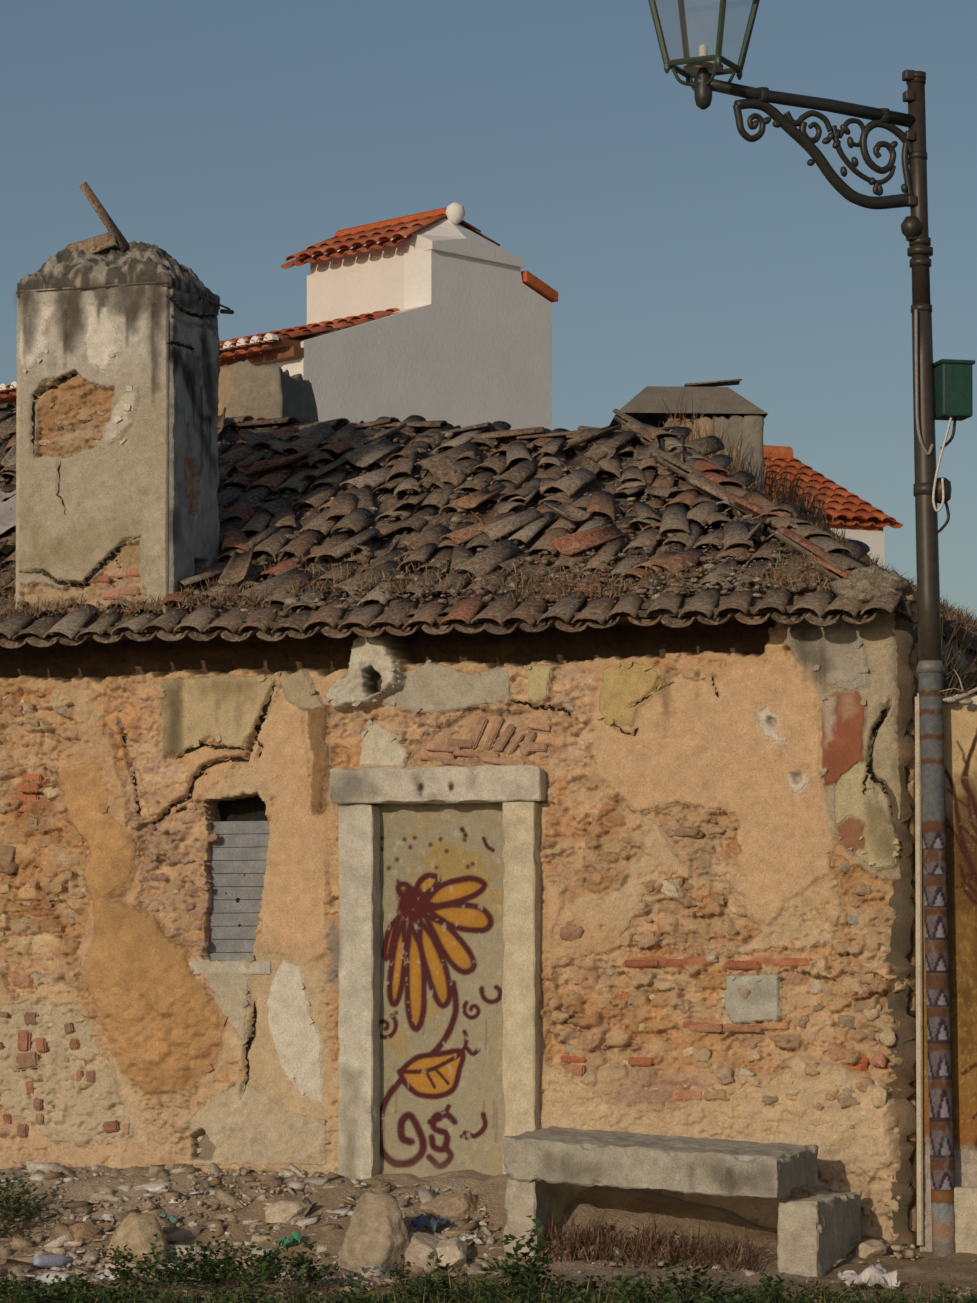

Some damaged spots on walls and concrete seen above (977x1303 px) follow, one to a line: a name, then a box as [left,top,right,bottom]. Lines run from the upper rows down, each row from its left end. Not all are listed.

leakage [19,289,35,335]
leakage [58,286,82,349]
spalling [34,304,137,458]
leakage [98,284,217,328]
leakage [155,338,216,465]
spalling [19,540,147,615]
peeling [157,630,405,756]
spalling [359,664,556,767]
spalling [98,694,220,949]
spalling [0,690,134,1147]
spalling [544,691,913,1131]
peeling [265,960,329,1144]